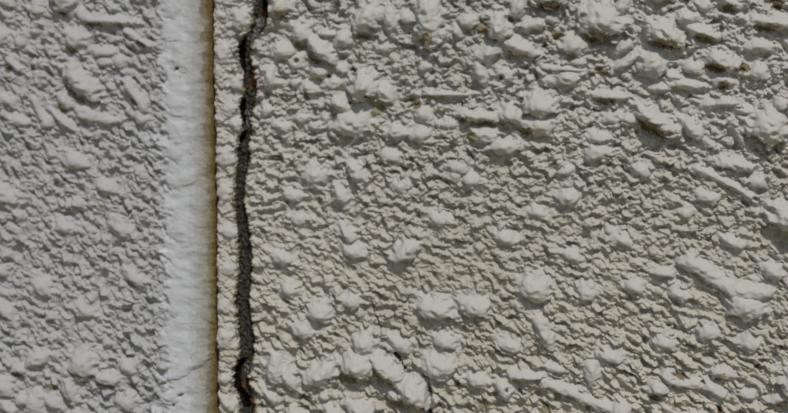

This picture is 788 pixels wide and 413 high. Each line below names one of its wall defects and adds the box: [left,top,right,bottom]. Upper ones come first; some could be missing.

crack [232,0,269,413]
crack [371,300,432,388]